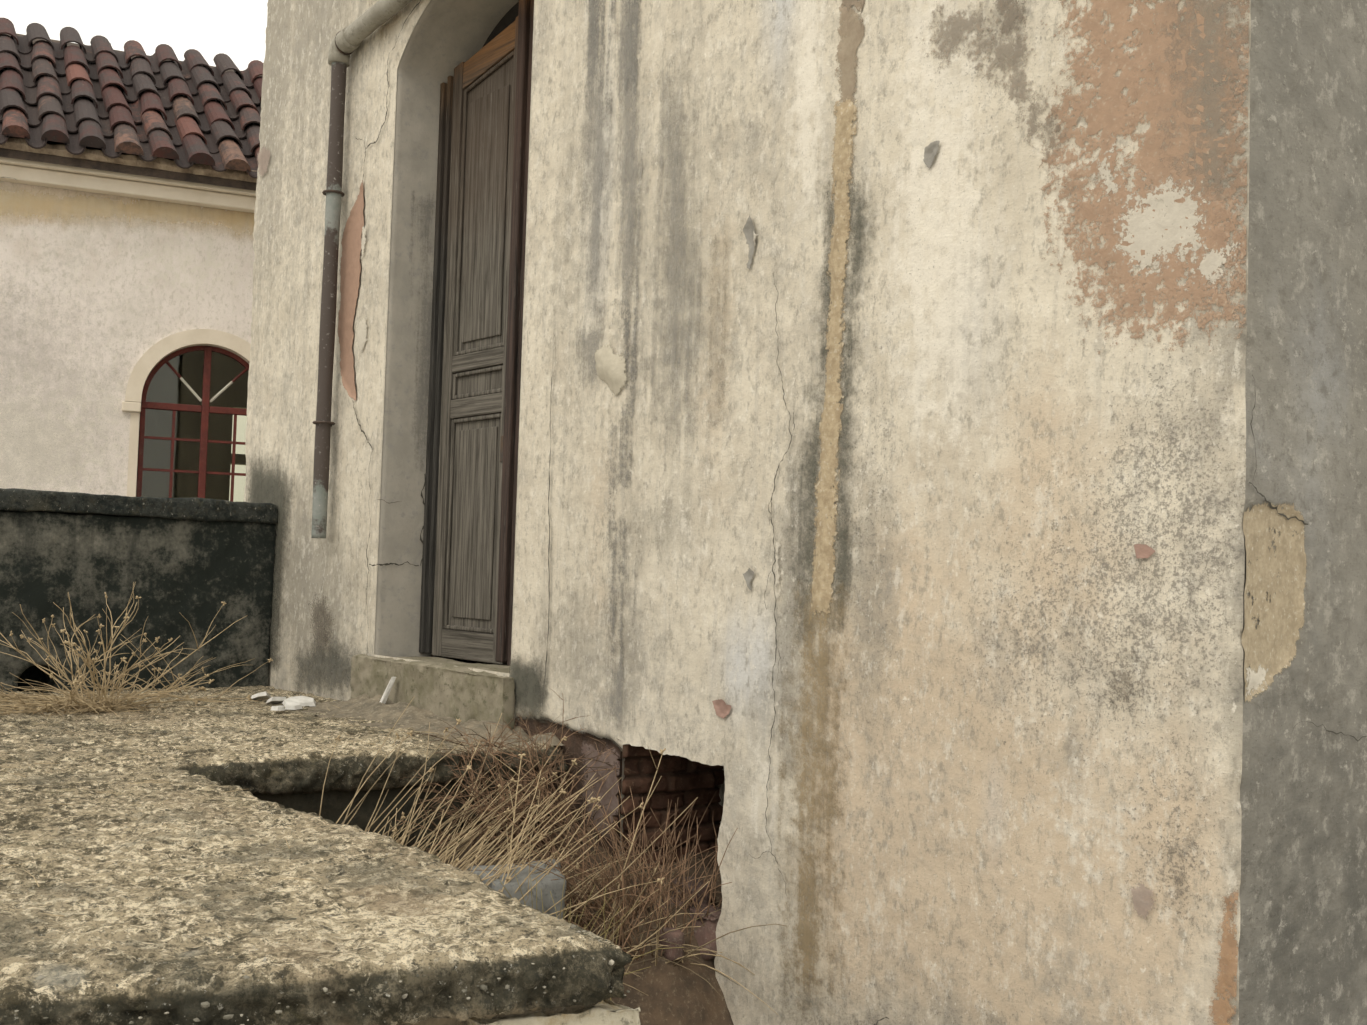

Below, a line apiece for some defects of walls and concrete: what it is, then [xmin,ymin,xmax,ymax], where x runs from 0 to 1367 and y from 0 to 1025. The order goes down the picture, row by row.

peeling [338,180,368,400]
damp [581,331,599,382]
damp [587,0,653,487]
peeling [916,0,1250,358]
damp [608,521,626,719]
crack [749,274,795,896]
damp [779,98,867,1009]
spalling [1241,501,1307,702]
spalling [515,717,622,866]